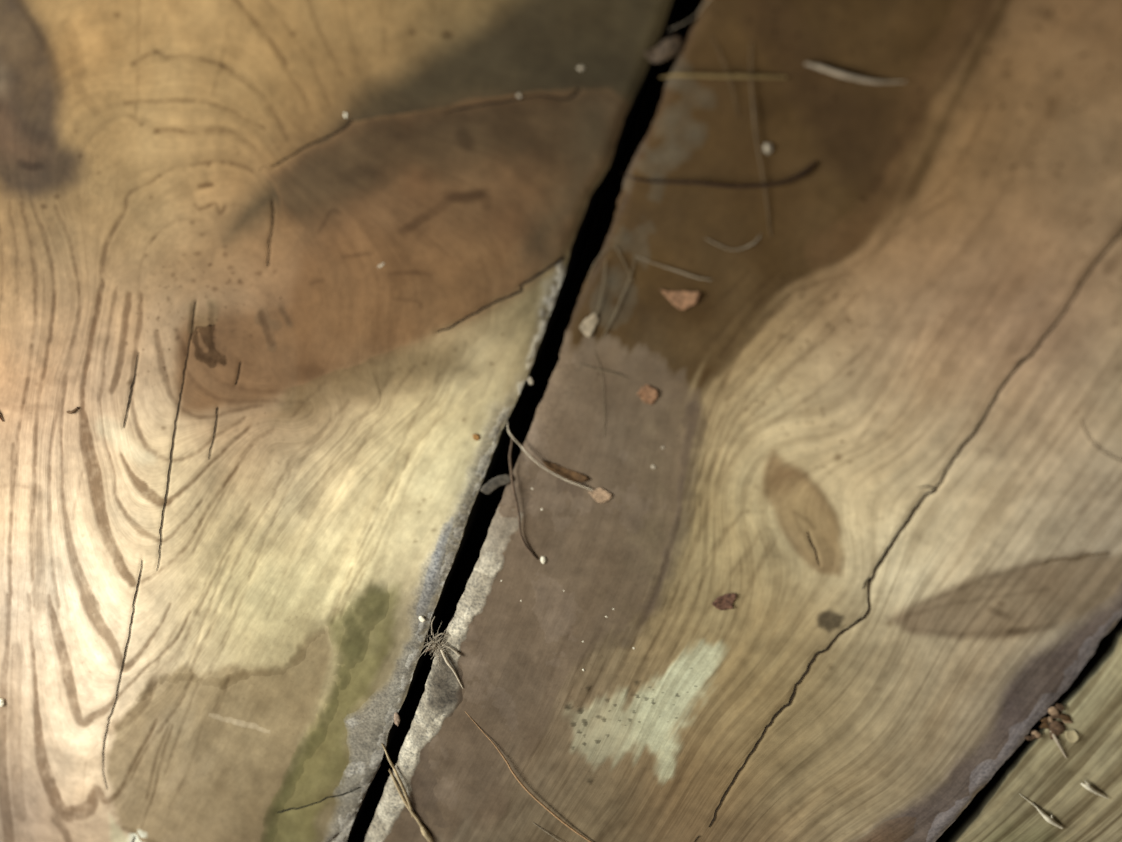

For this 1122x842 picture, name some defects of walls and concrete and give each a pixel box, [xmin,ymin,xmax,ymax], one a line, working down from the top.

crack [271,120,352,168]
leakage [210,0,672,256]
leakage [92,412,161,471]
crack [102,302,195,789]
leakage [183,295,221,338]
leakage [254,297,293,353]
leakage [262,332,484,435]
leakage [322,0,1016,842]
crack [695,231,1122,842]
leakage [102,620,334,842]